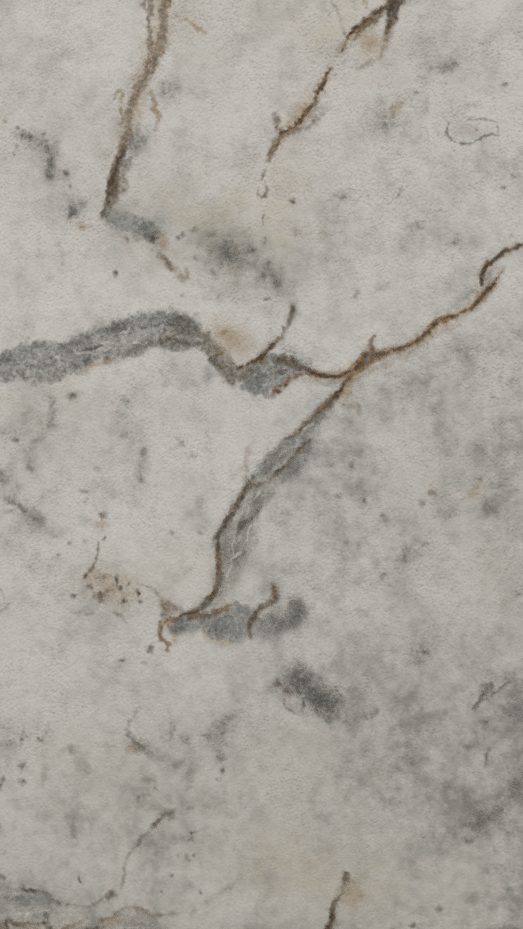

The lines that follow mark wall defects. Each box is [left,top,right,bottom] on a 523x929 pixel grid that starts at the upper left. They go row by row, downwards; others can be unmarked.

crack [342,0,402,48]
crack [268,68,331,162]
crack [148,244,523,652]
crack [325,872,360,929]